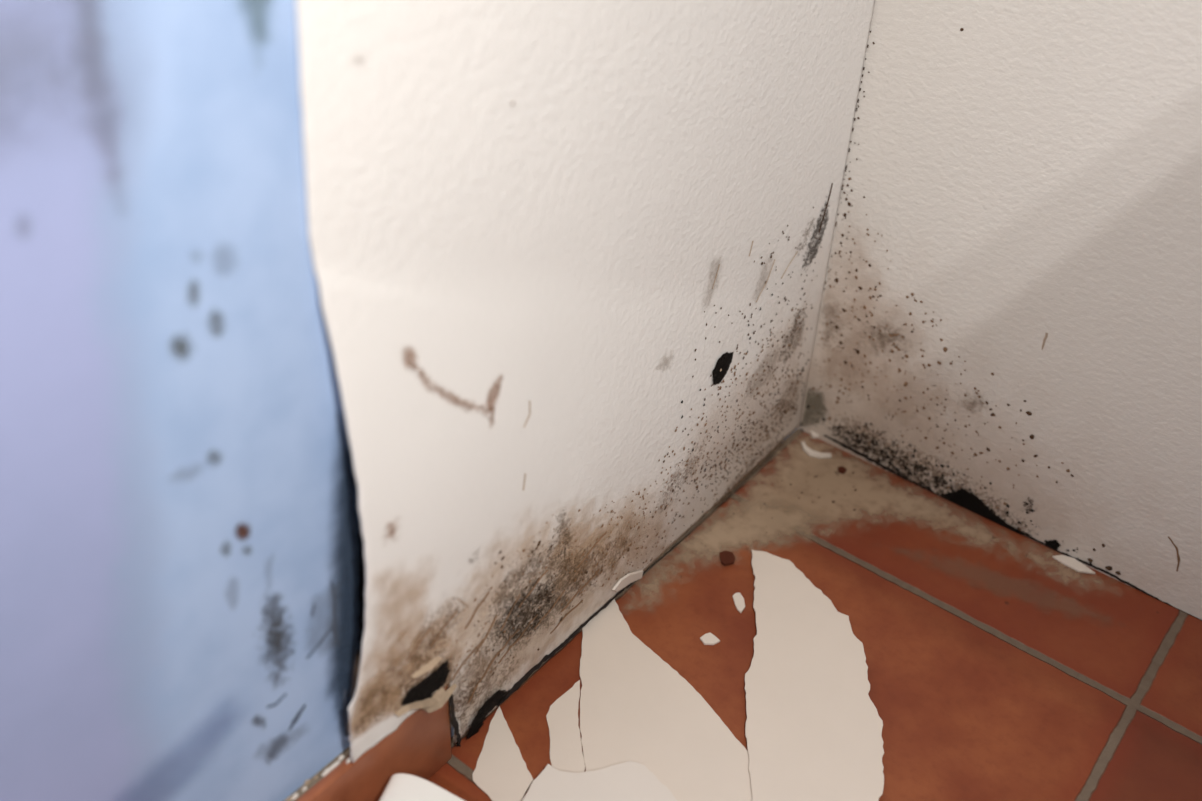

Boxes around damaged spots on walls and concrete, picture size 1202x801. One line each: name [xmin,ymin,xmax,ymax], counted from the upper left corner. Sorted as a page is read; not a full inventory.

water stain [396,31,1201,747]
peeling [410,656,442,679]
peeling [394,683,457,717]